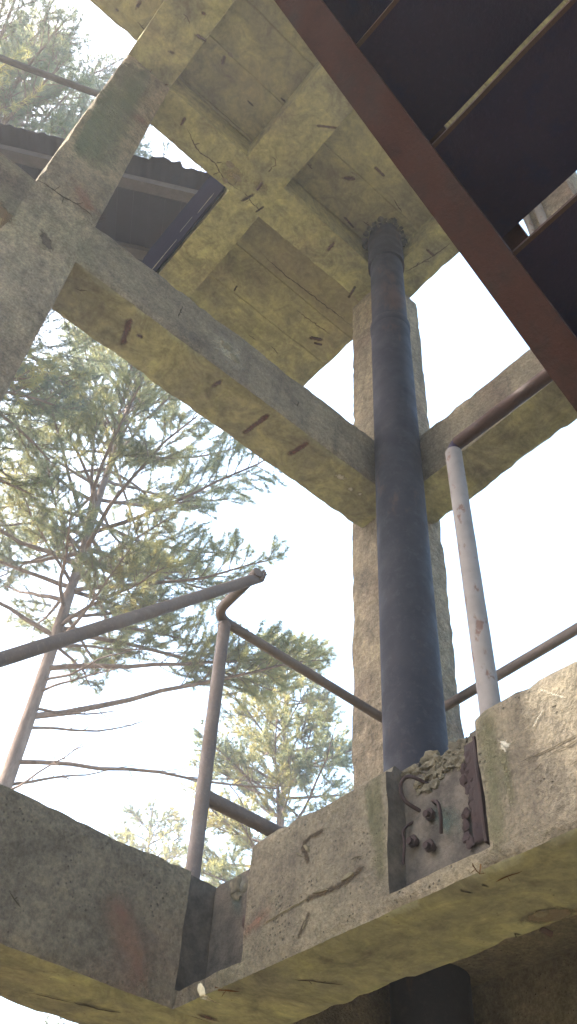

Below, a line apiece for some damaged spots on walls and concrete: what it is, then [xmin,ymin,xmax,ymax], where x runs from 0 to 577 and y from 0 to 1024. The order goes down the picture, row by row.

crack [188,131,259,209]
rust [121,319,142,345]
rust [243,414,269,434]
spalling [399,736,490,865]